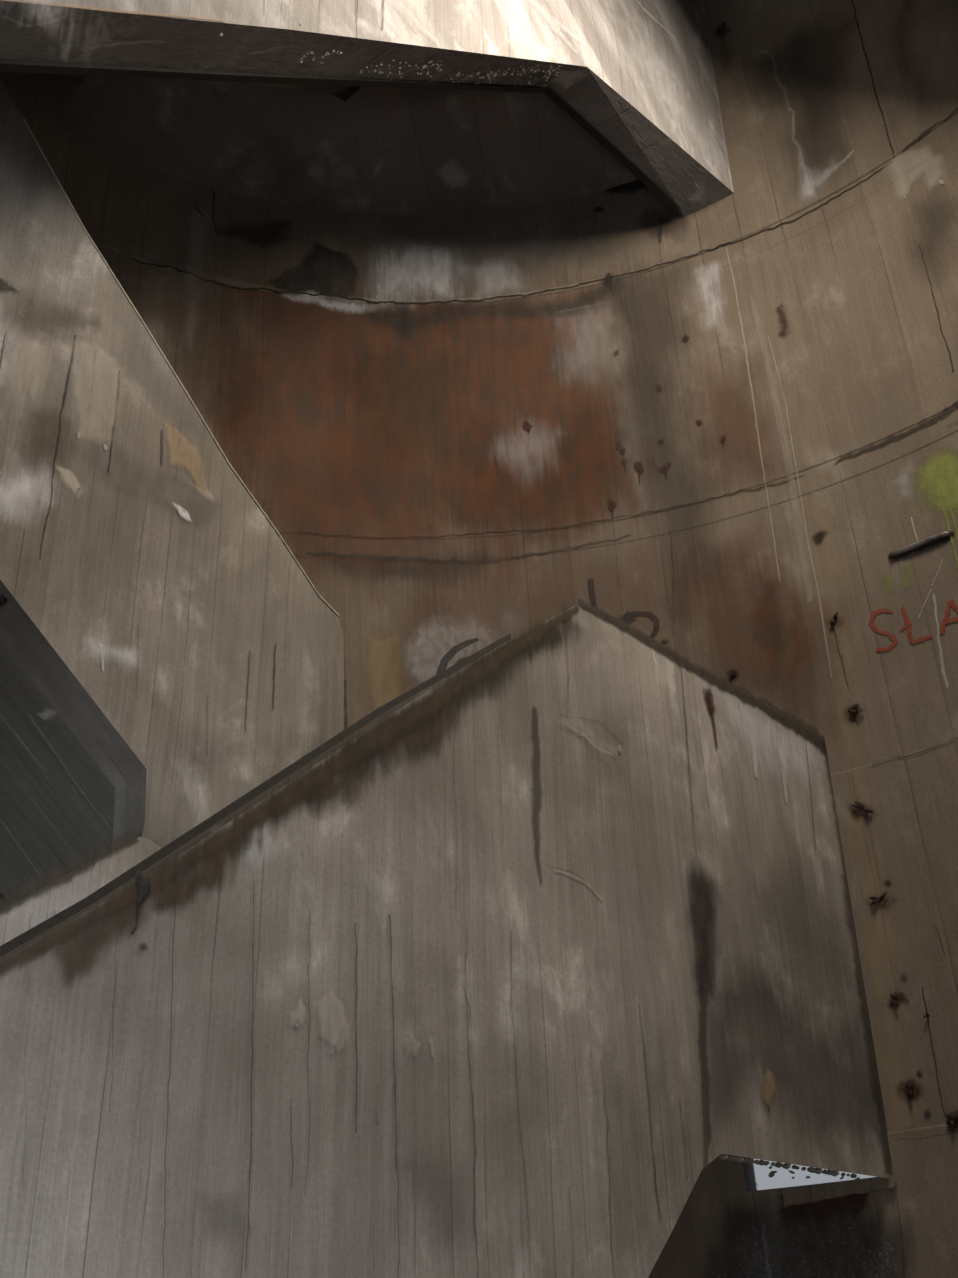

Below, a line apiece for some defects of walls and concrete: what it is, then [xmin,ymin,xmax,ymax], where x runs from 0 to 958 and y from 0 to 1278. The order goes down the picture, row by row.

water stain [288,248,619,326]
crack [132,0,958,305]
crack [834,245,958,465]
crack [298,474,804,564]
water stain [0,599,841,990]
water stain [843,857,892,1175]